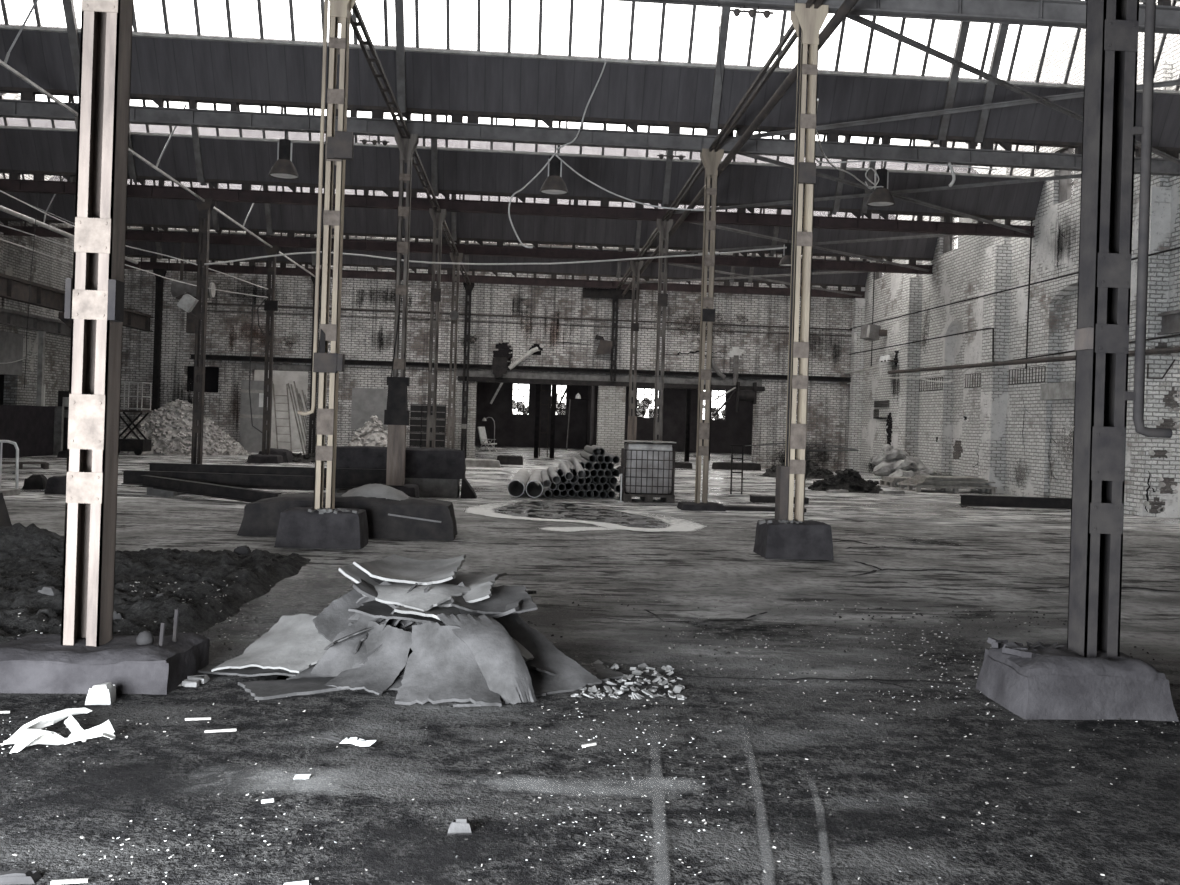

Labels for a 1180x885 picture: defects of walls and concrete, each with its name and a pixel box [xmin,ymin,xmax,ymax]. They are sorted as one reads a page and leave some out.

spalling [1153,386,1180,431]
spalling [1148,449,1172,458]
spalling [1143,477,1178,514]